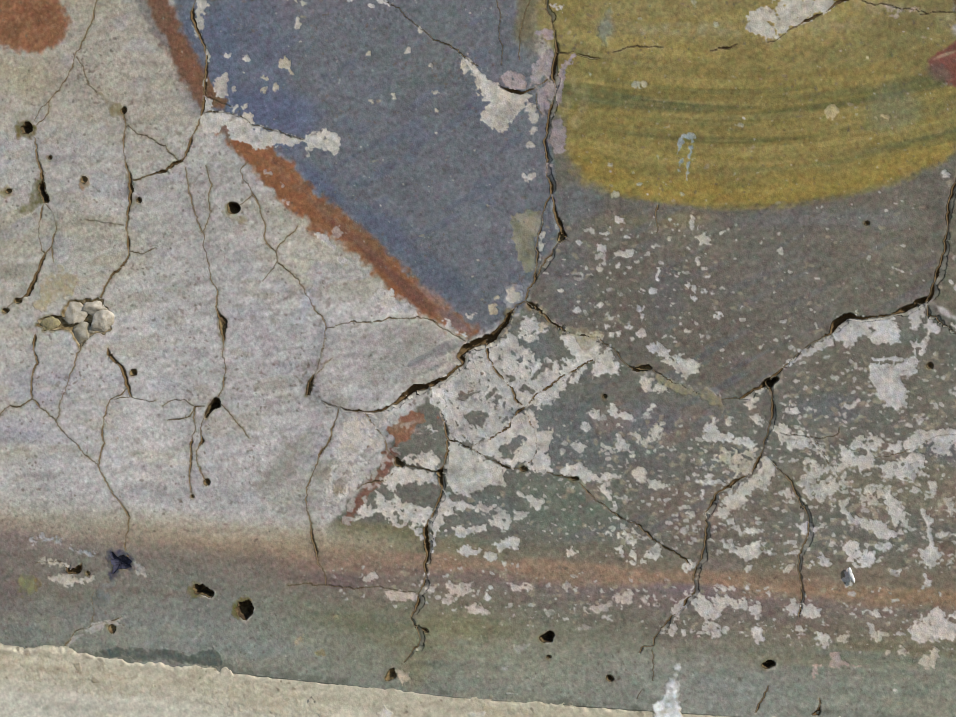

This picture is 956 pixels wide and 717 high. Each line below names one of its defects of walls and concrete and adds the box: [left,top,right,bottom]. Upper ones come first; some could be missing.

peeling [745,0,854,43]
peeling [200,72,341,157]
peeling [460,28,577,183]
crack [0,0,304,557]
peeling [353,215,730,568]
crack [240,0,956,699]
peeling [679,306,956,590]
crack [37,560,82,574]
peeling [385,578,494,616]
peeling [577,559,767,645]
peeling [782,598,862,679]
water stain [651,663,683,717]